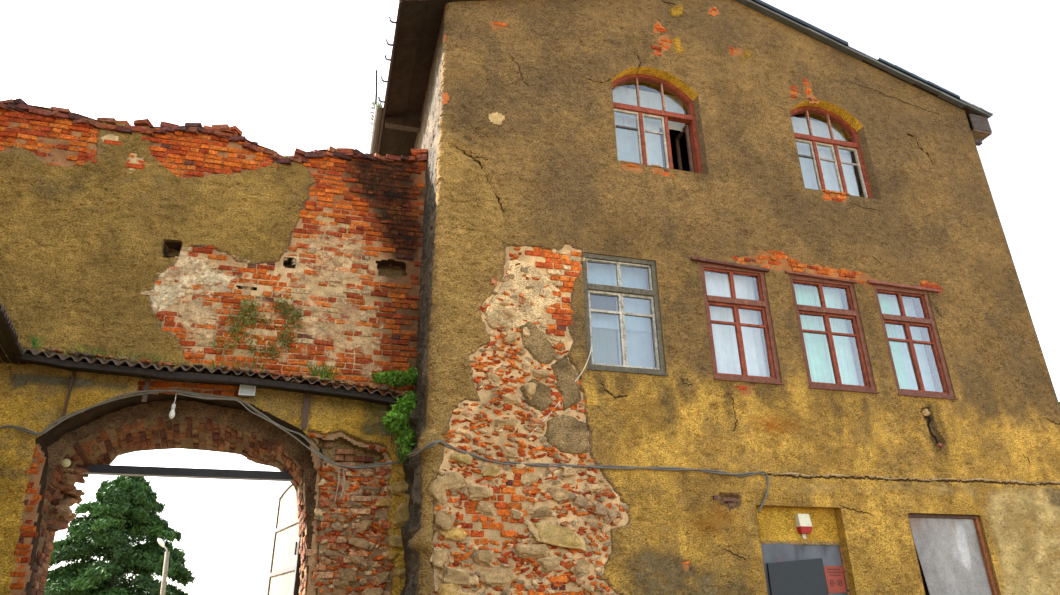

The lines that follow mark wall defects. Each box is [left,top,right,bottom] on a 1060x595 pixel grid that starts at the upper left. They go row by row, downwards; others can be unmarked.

spalling [651,20,672,57]
spalling [0,98,428,398]
crack [448,143,504,212]
spalling [732,249,875,289]
spalling [429,245,629,595]
spalling [9,444,46,595]
spalling [305,432,410,595]
peeling [990,489,1060,595]